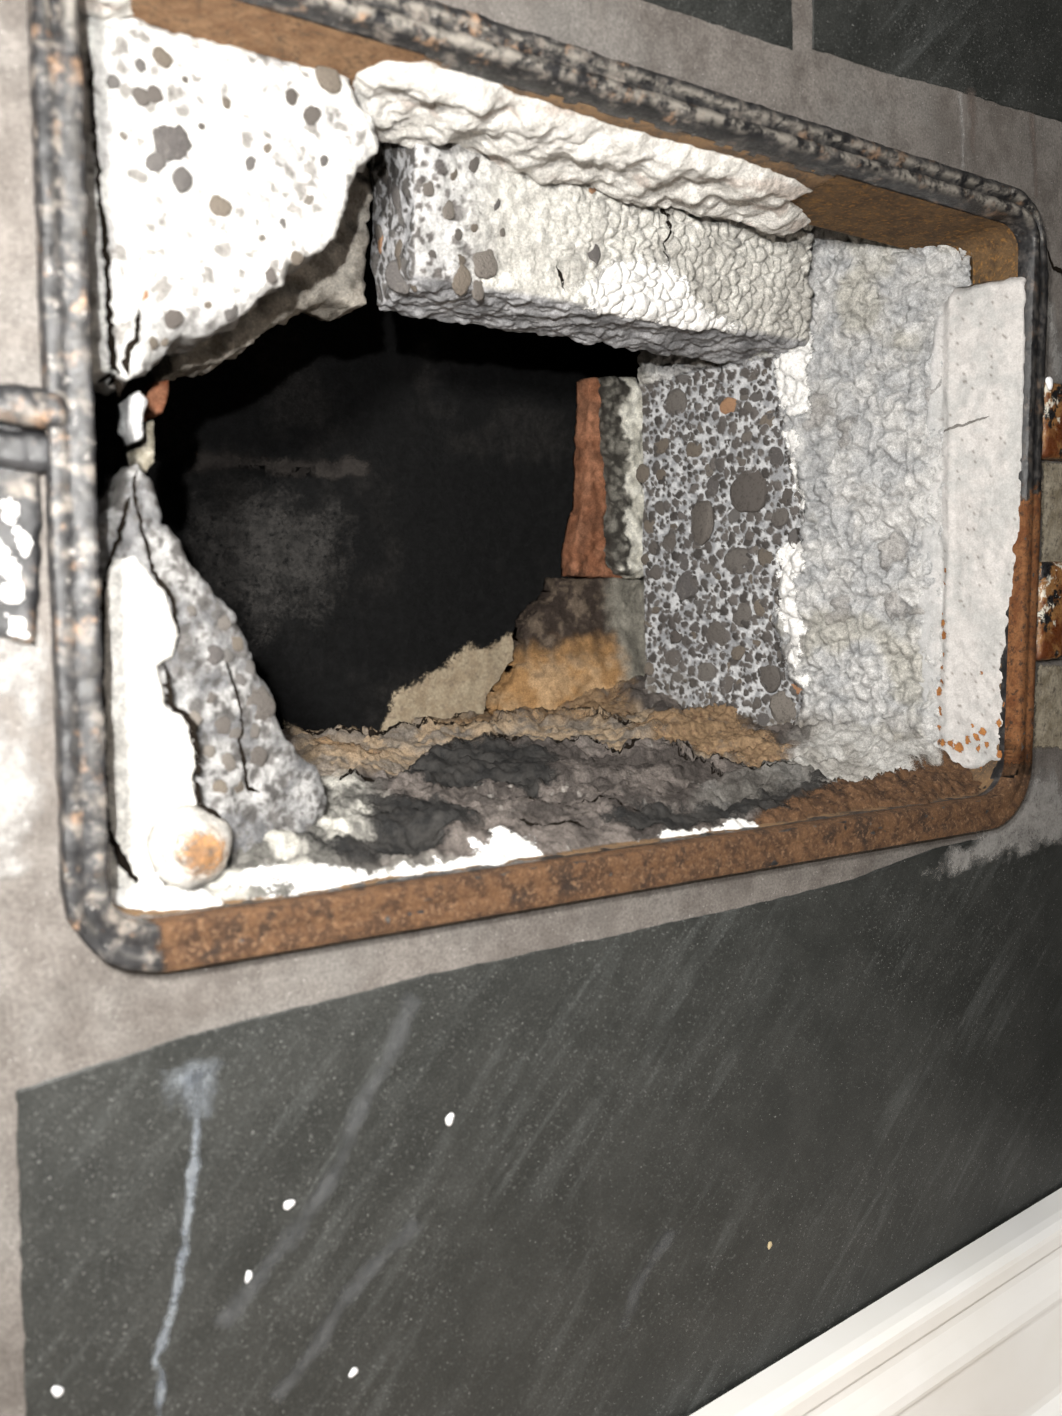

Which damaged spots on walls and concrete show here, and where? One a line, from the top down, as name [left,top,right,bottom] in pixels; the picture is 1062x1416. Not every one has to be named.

crack [87,43,141,396]
peeling [0,497,33,639]
crack [100,471,225,884]
crack [224,655,259,792]
spalling [561,377,622,578]
rust [142,485,1041,972]
spalling [636,355,805,727]
efflorescence [153,1067,208,1407]